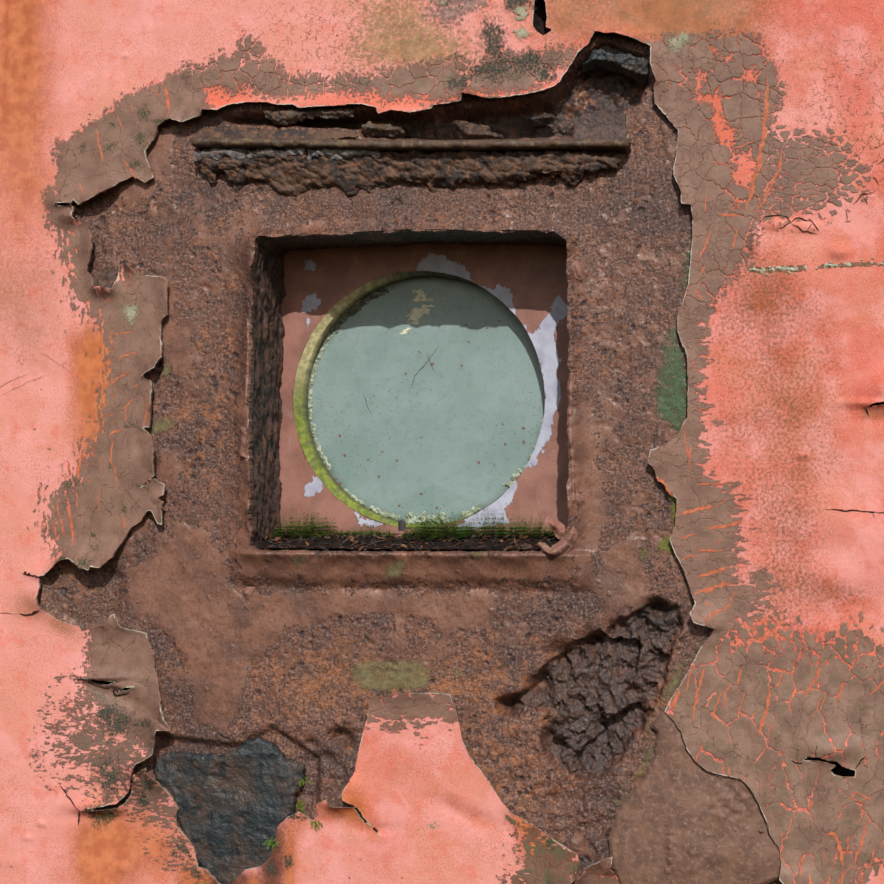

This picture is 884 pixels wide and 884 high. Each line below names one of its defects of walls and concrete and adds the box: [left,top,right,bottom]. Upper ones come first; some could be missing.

corrosion [0,0,45,203]
water stain [446,0,557,90]
crack [752,214,819,237]
peeling [19,30,583,619]
corrosion [73,328,122,444]
peeling [495,22,884,884]
crack [824,508,884,516]
water stain [85,753,123,827]
water stain [94,703,150,736]
peeling [29,614,216,884]
crack [677,727,777,846]
corrosion [232,827,294,884]